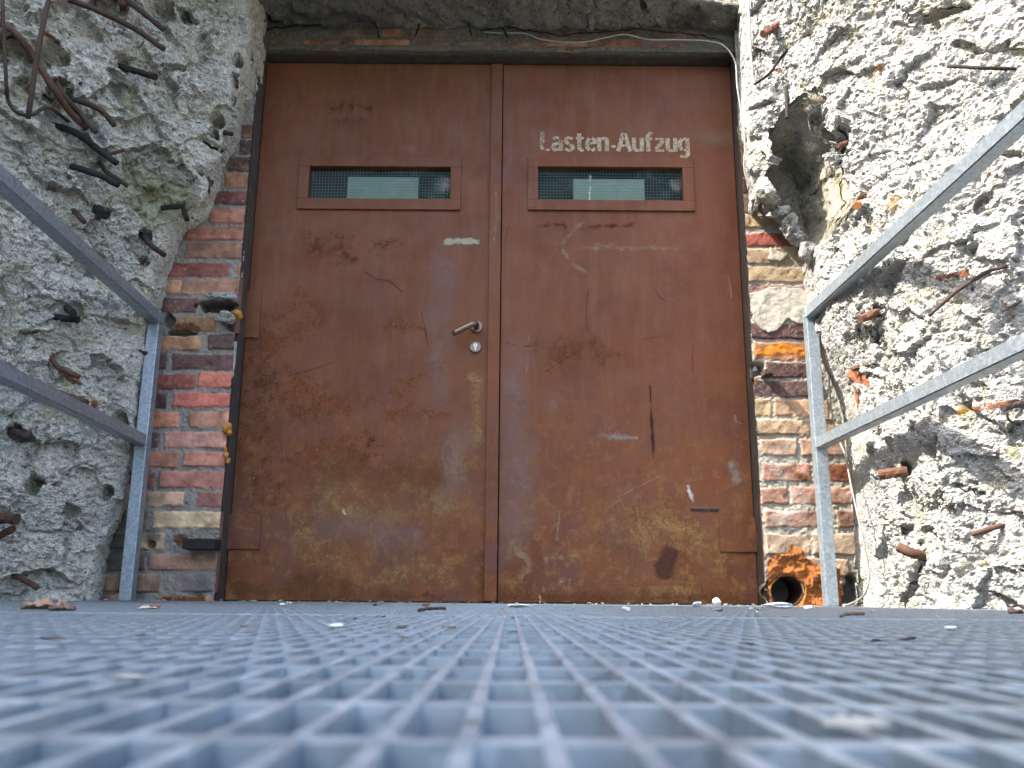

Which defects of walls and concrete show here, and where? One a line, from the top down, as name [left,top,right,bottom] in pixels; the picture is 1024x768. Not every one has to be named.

spalling [807,103,828,136]
spalling [831,134,850,154]
rust [935,270,970,280]
rust [755,342,805,355]
rust [941,399,1019,419]